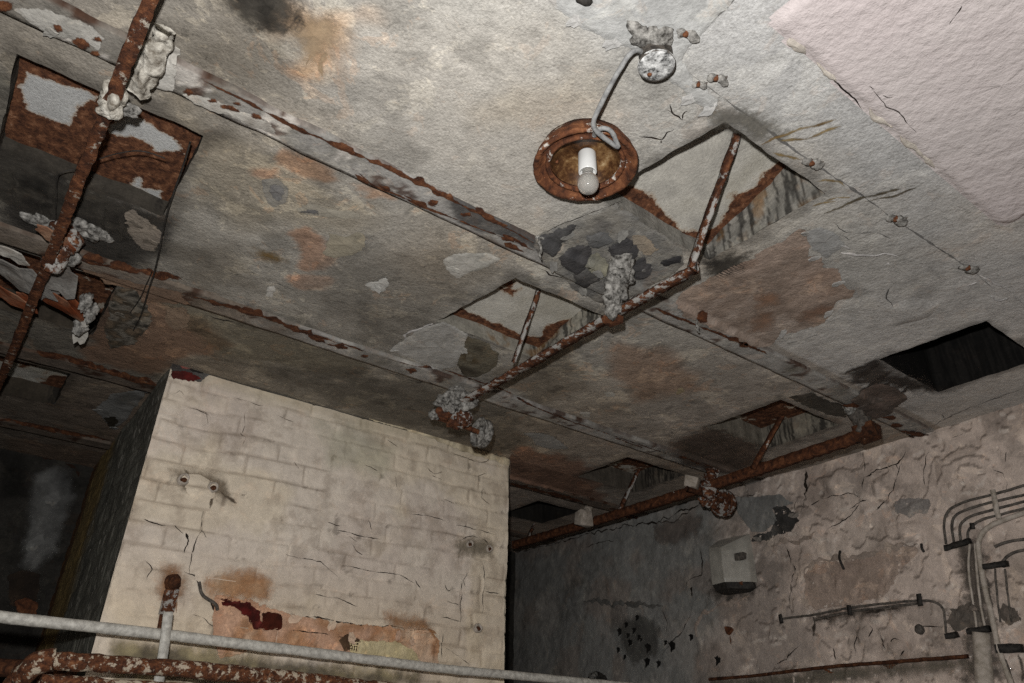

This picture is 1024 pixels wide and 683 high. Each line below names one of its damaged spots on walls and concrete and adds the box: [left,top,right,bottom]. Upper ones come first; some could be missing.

corrosion [73,37,102,56]
corrosion [203,80,534,252]
corrosion [81,253,182,281]
spalling [534,203,684,303]
corrosion [656,308,767,354]
corrosion [390,359,485,384]
crack [794,392,1013,529]
peeling [735,494,799,542]
crack [145,515,214,625]
crack [288,452,499,665]
spalling [212,595,440,663]
leakage [616,615,675,668]